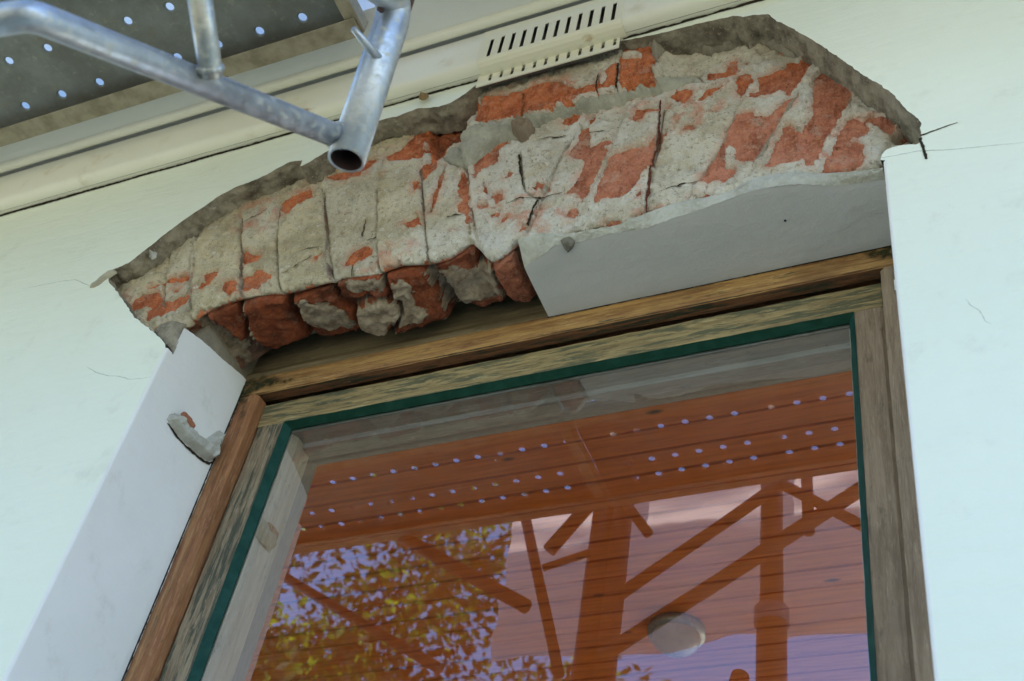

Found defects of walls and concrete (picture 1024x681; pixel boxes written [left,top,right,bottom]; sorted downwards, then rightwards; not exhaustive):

spalling [90,14,921,368]
crack [508,154,562,226]
crack [645,100,694,213]
crack [918,122,958,159]